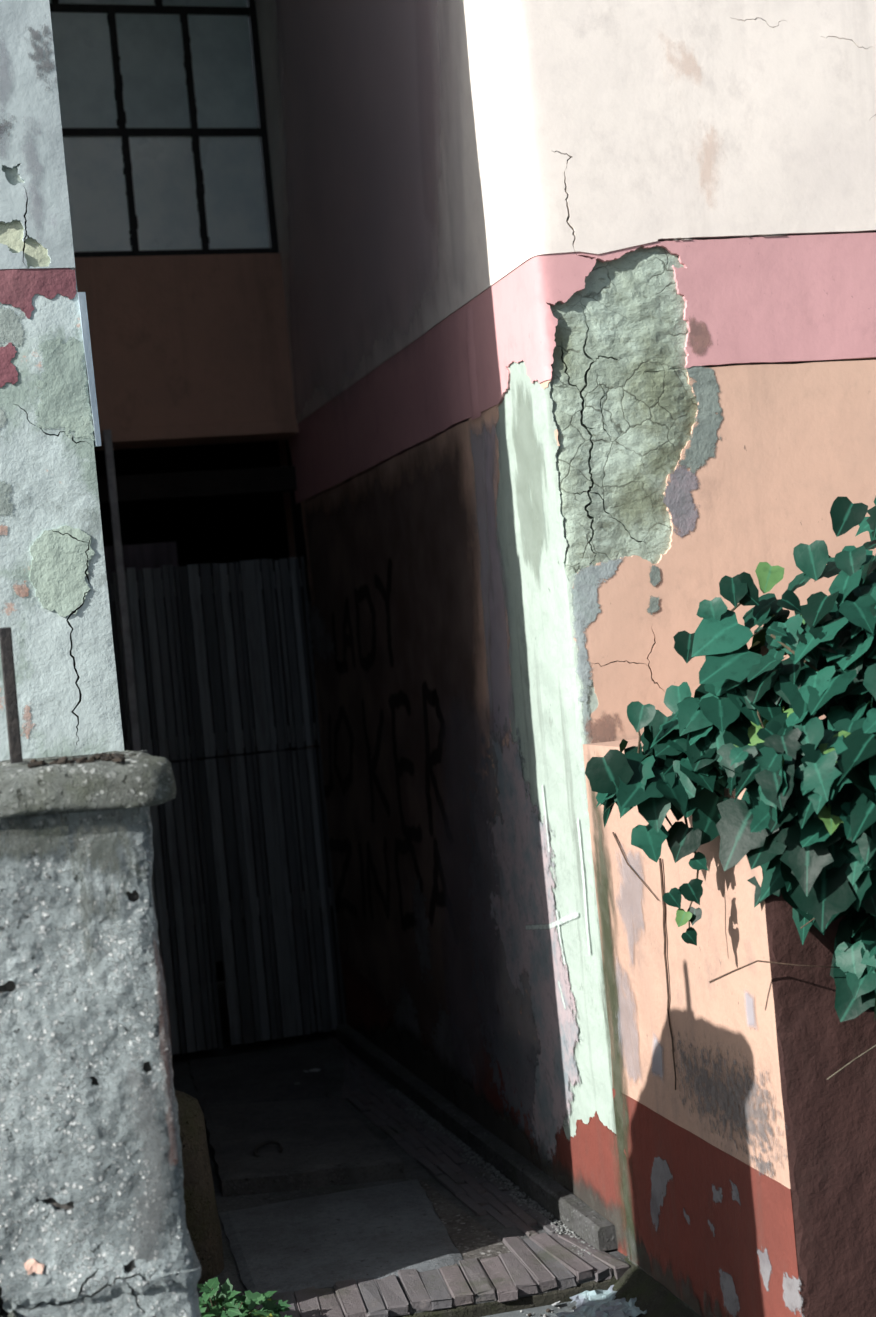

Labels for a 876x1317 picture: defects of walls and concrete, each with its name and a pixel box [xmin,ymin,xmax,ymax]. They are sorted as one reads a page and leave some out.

peeling [2,165,24,186]
peeling [0,220,50,268]
crack [561,317,643,542]
peeling [0,480,13,535]
peeling [13,525,95,617]
crack [60,533,91,745]
peeling [483,246,723,1163]